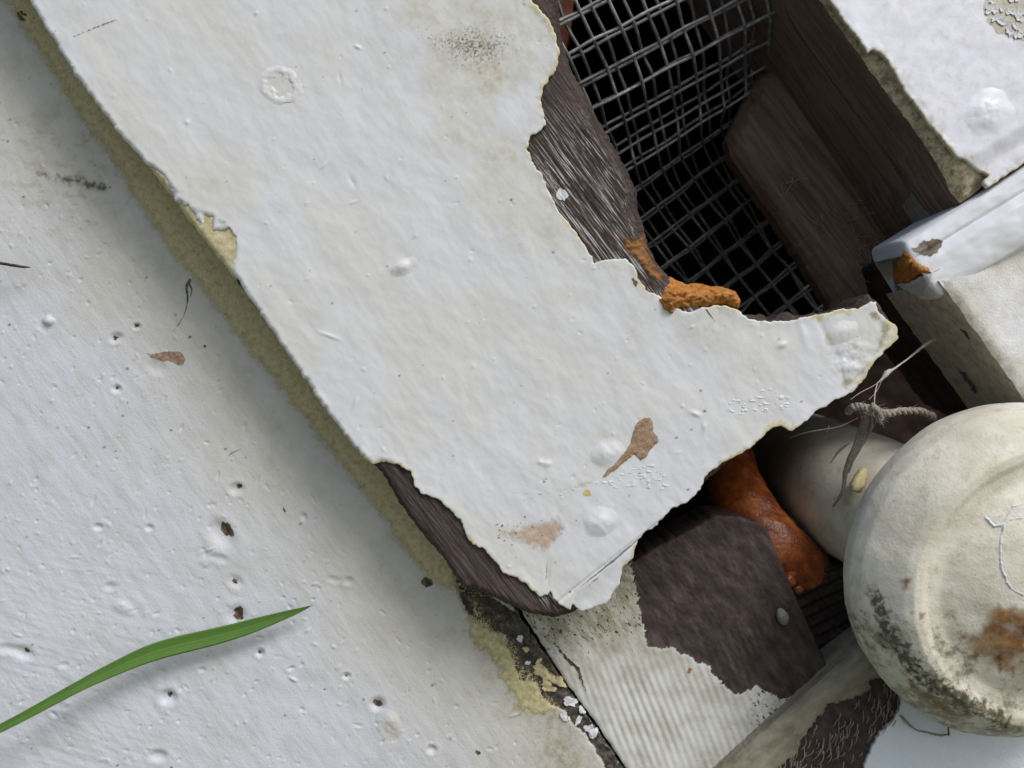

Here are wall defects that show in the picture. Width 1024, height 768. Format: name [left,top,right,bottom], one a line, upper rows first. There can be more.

peeling [984,0,1024,41]
spalling [567,0,823,317]
peeling [148,166,237,280]